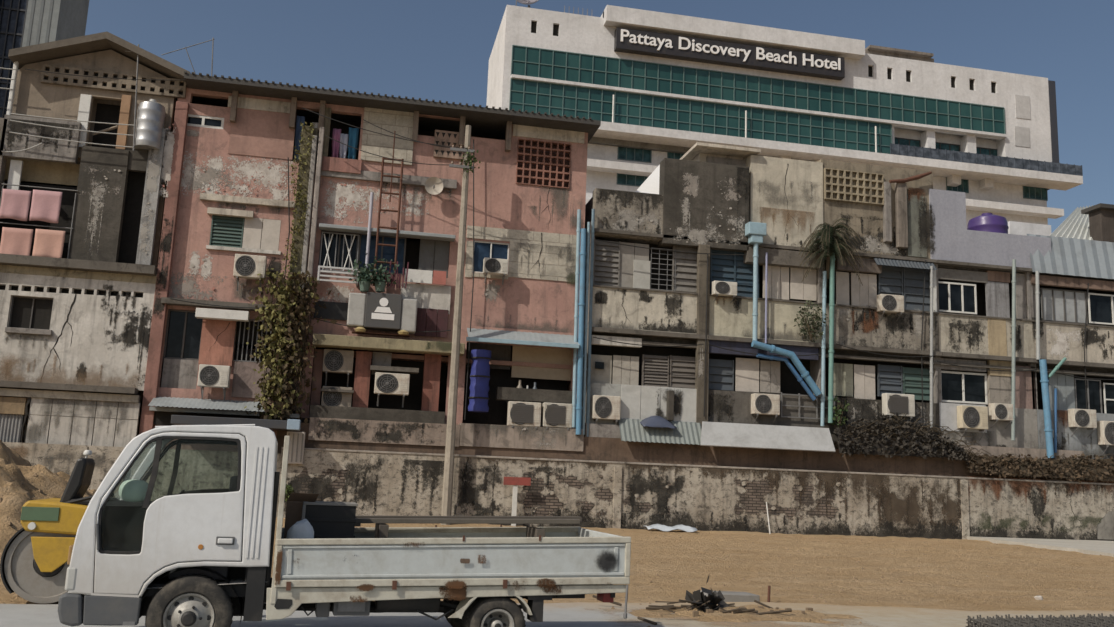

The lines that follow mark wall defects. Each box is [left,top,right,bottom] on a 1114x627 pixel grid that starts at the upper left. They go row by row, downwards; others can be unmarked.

water stain [86,182,107,244]
peeling [139,124,296,264]
peeling [321,178,429,223]
water stain [596,189,663,239]
crack [21,294,76,443]
water stain [0,214,173,388]
water stain [594,289,697,333]
water stain [844,305,985,352]
water stain [1080,327,1114,359]
water stain [284,457,384,513]
water stain [400,459,444,516]
water stain [454,457,1114,541]